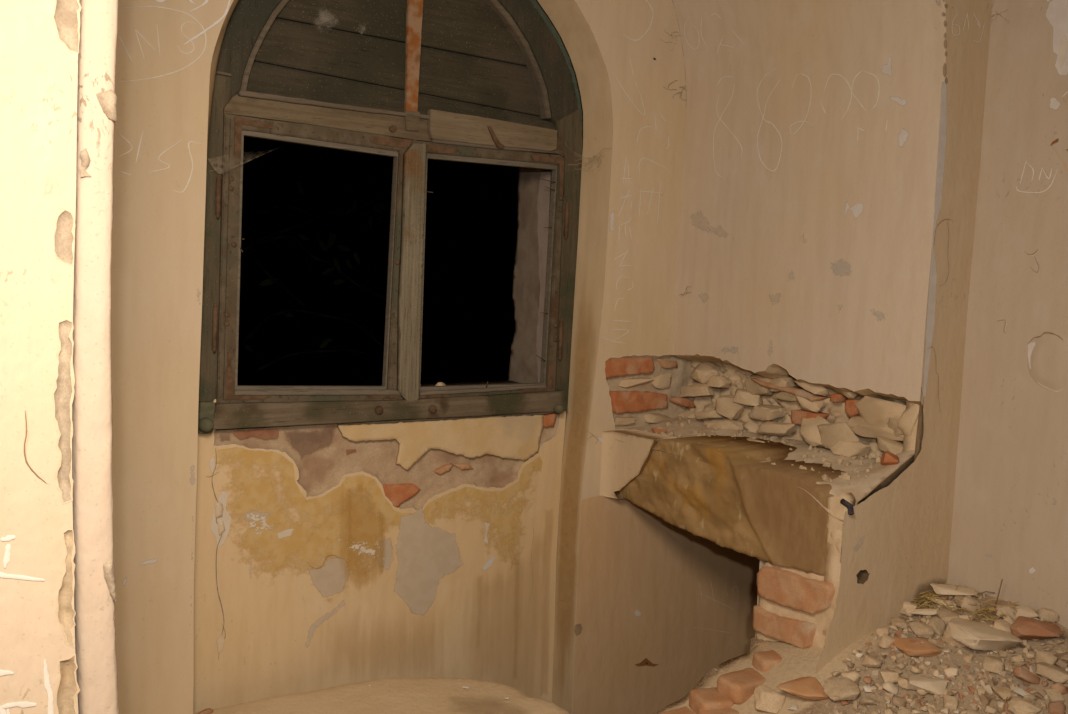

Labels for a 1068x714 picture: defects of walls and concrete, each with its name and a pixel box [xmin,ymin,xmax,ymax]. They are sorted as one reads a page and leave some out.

flaking render [52,0,81,53]
peeling [1045,0,1068,76]
flaking render [96,89,117,121]
flaking render [80,149,92,177]
flaking render [53,209,76,265]
spalling [604,0,948,649]
flaking render [52,320,75,505]
flaking render [209,412,560,646]
flaking render [103,558,127,601]
flaking render [54,529,80,714]